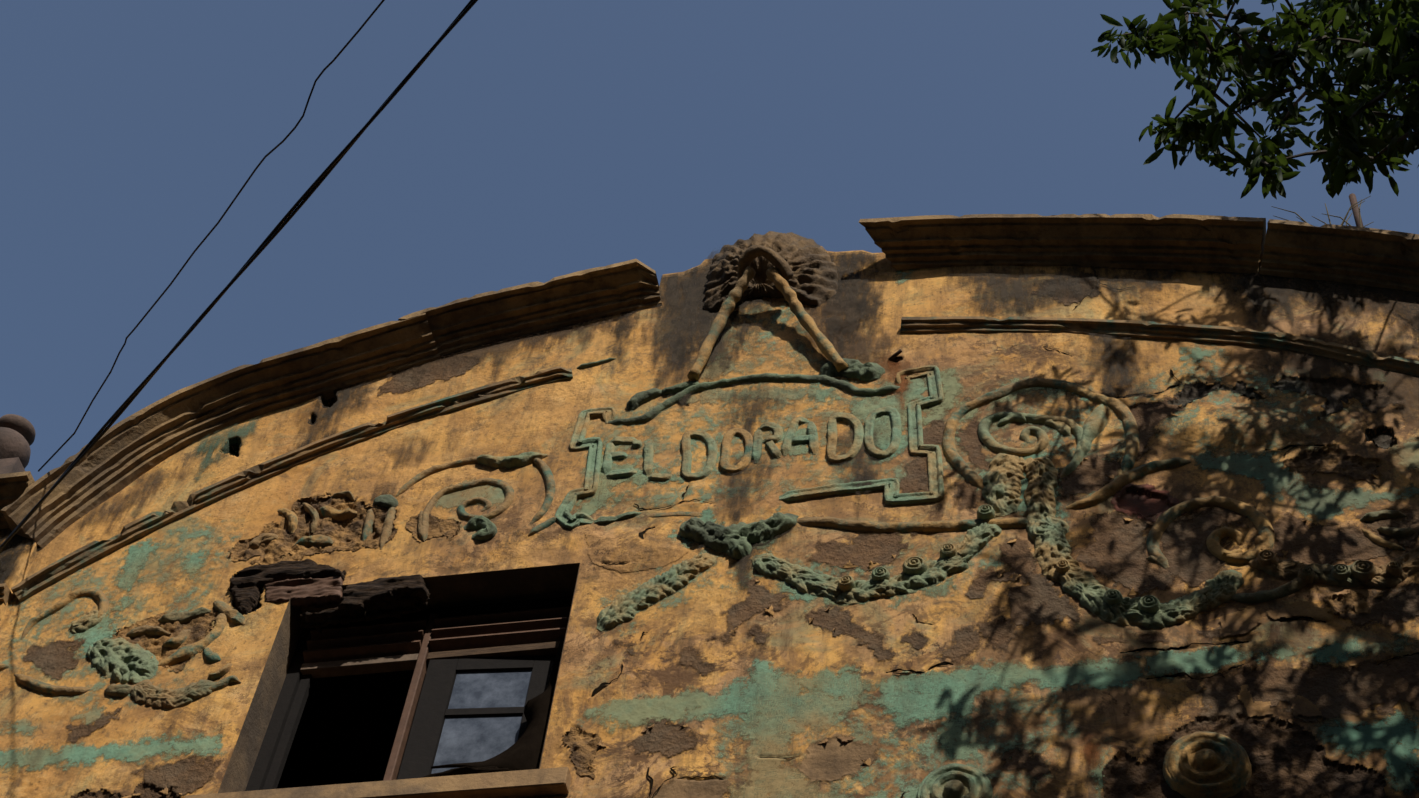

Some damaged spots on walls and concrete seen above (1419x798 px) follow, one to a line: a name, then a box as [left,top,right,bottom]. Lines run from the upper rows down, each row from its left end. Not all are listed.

leakage [950,266,1175,317]
spalling [112,493,462,672]
peeling [71,754,224,798]
spalling [561,725,606,778]
peeling [624,717,698,757]
spalling [1101,655,1419,798]